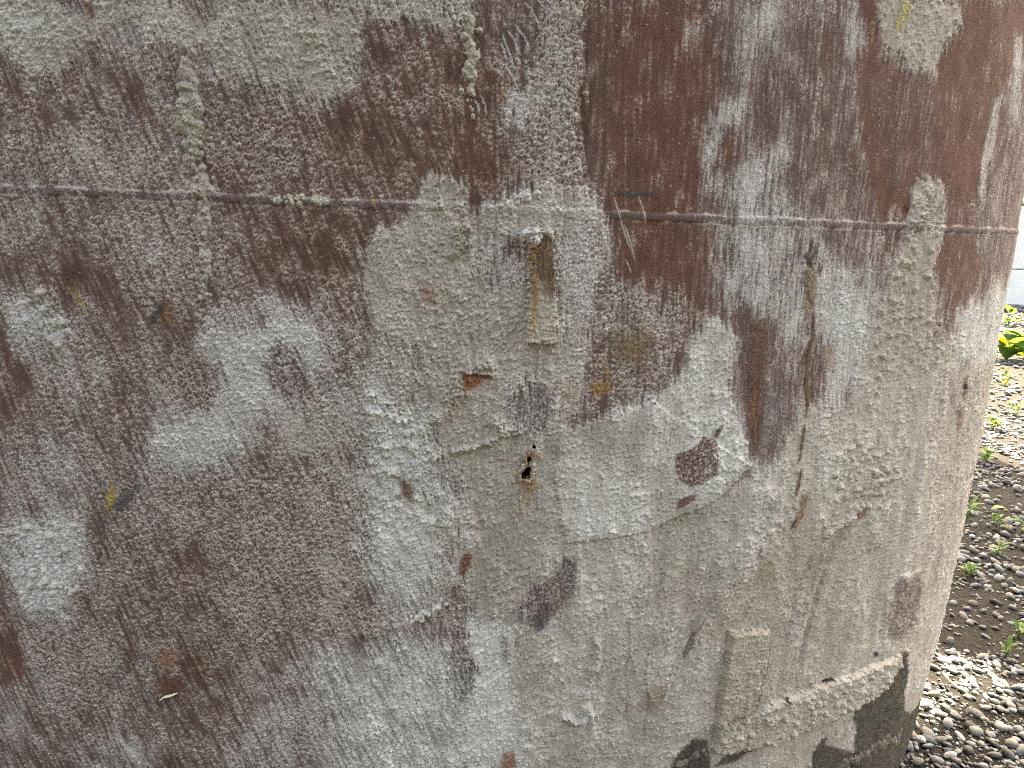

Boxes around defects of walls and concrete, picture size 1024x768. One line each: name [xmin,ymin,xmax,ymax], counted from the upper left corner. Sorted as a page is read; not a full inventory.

corrosion [744,317,787,460]